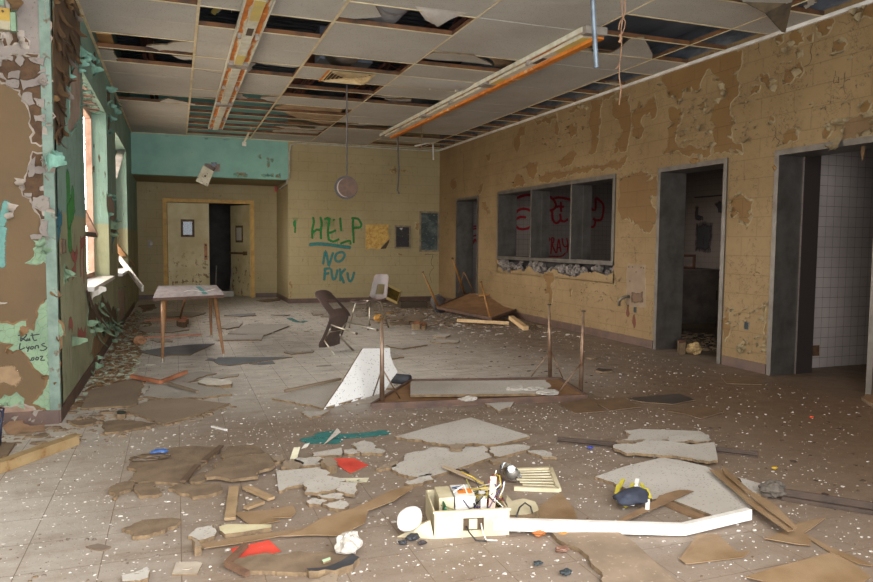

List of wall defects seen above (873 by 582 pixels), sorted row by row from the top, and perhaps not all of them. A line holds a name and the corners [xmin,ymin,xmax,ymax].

peeling [848,4,873,23]
spalling [0,0,123,265]
peeling [512,17,864,234]
peeling [822,99,873,150]
peeling [0,264,155,423]
spalling [497,259,615,304]